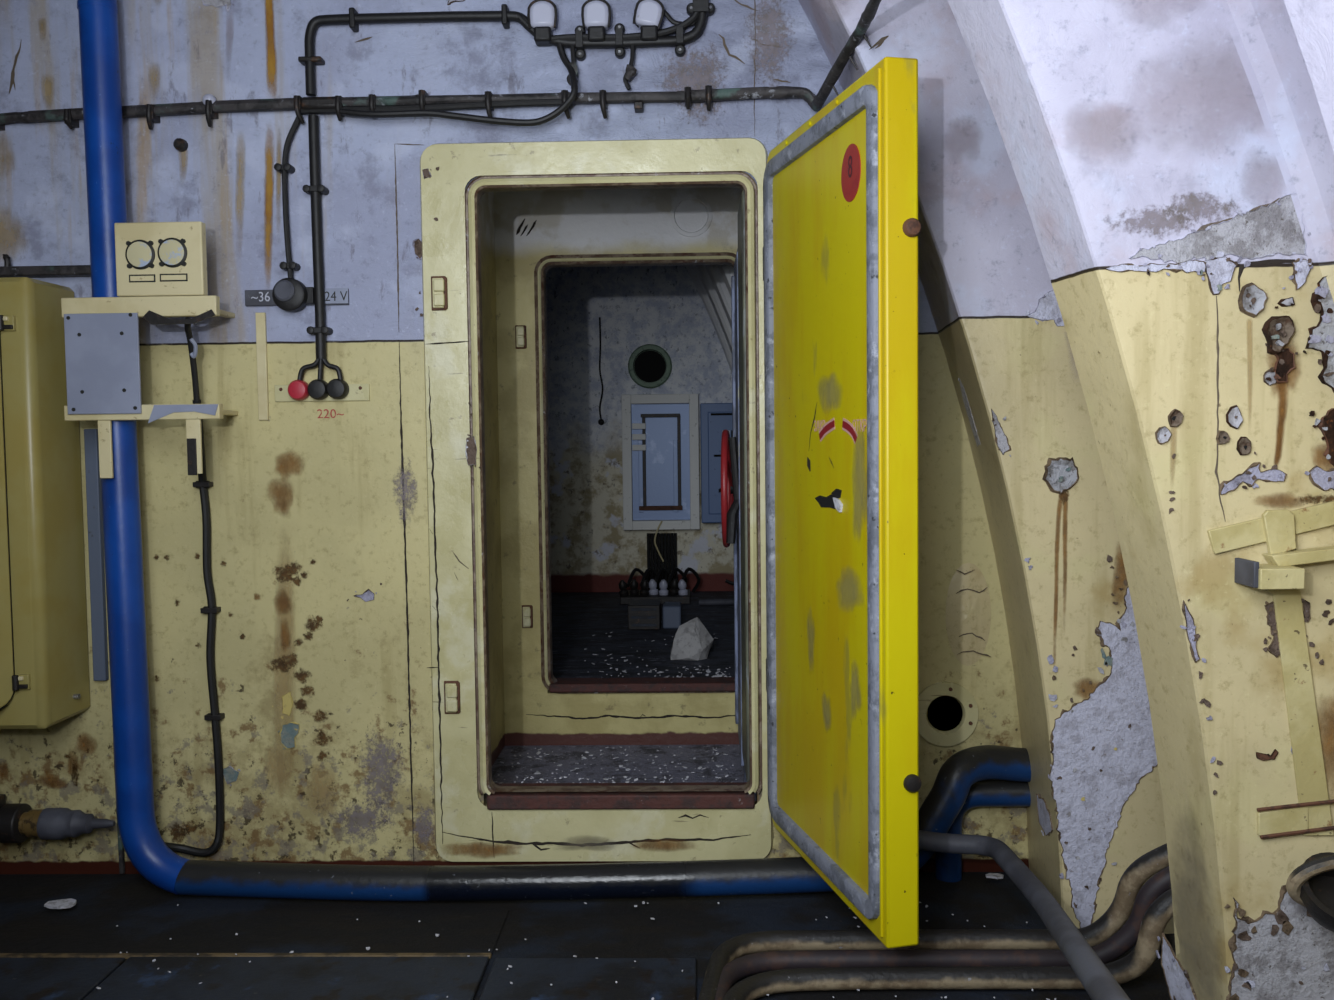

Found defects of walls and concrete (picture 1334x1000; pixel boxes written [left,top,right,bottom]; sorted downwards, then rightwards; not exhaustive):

leakage [265,0,276,87]
leakage [265,146,280,268]
leakage [1113,193,1236,235]
peeling [1105,193,1334,393]
corrosion [1248,321,1307,464]
corrosion [272,454,300,512]
corrosion [1054,490,1069,630]
corrosion [269,559,332,808]
leakage [331,736,403,836]
peeling [1036,553,1158,928]
peeling [1156,932,1198,1000]
peeling [1224,885,1334,1000]